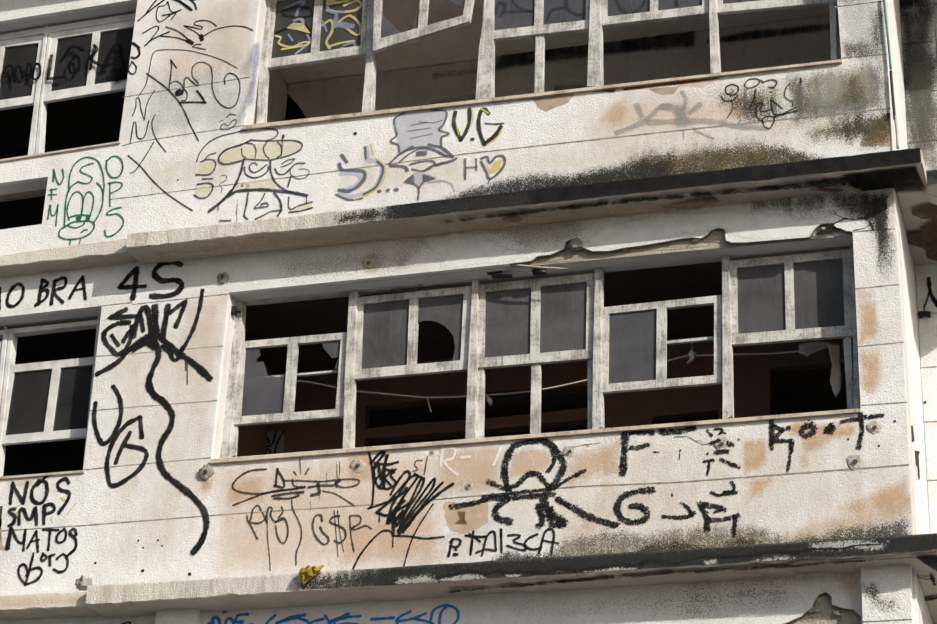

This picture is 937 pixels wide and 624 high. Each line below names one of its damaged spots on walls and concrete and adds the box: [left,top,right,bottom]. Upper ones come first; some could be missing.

peeling [522,94,574,112]
peeling [594,77,719,95]
damp [335,0,937,281]
spalling [509,227,746,268]
spalling [809,222,853,239]
peeling [906,196,937,261]
damp [296,517,937,593]
spalling [784,592,862,624]